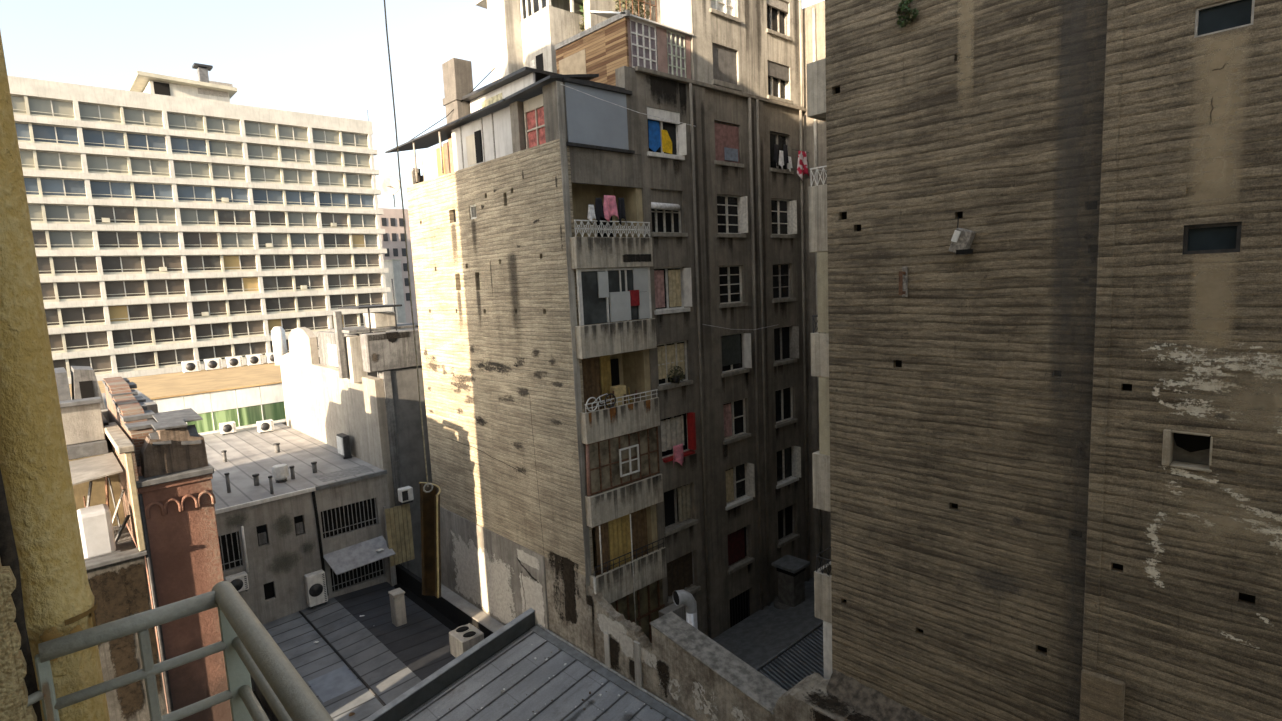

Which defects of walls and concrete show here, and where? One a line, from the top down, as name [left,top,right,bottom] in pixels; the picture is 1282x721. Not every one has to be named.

leakage [509,255,518,316]
efflorescence [1141,342,1282,434]
efflorescence [1144,466,1282,588]
leakage [548,525,693,633]
leakage [810,708,835,721]